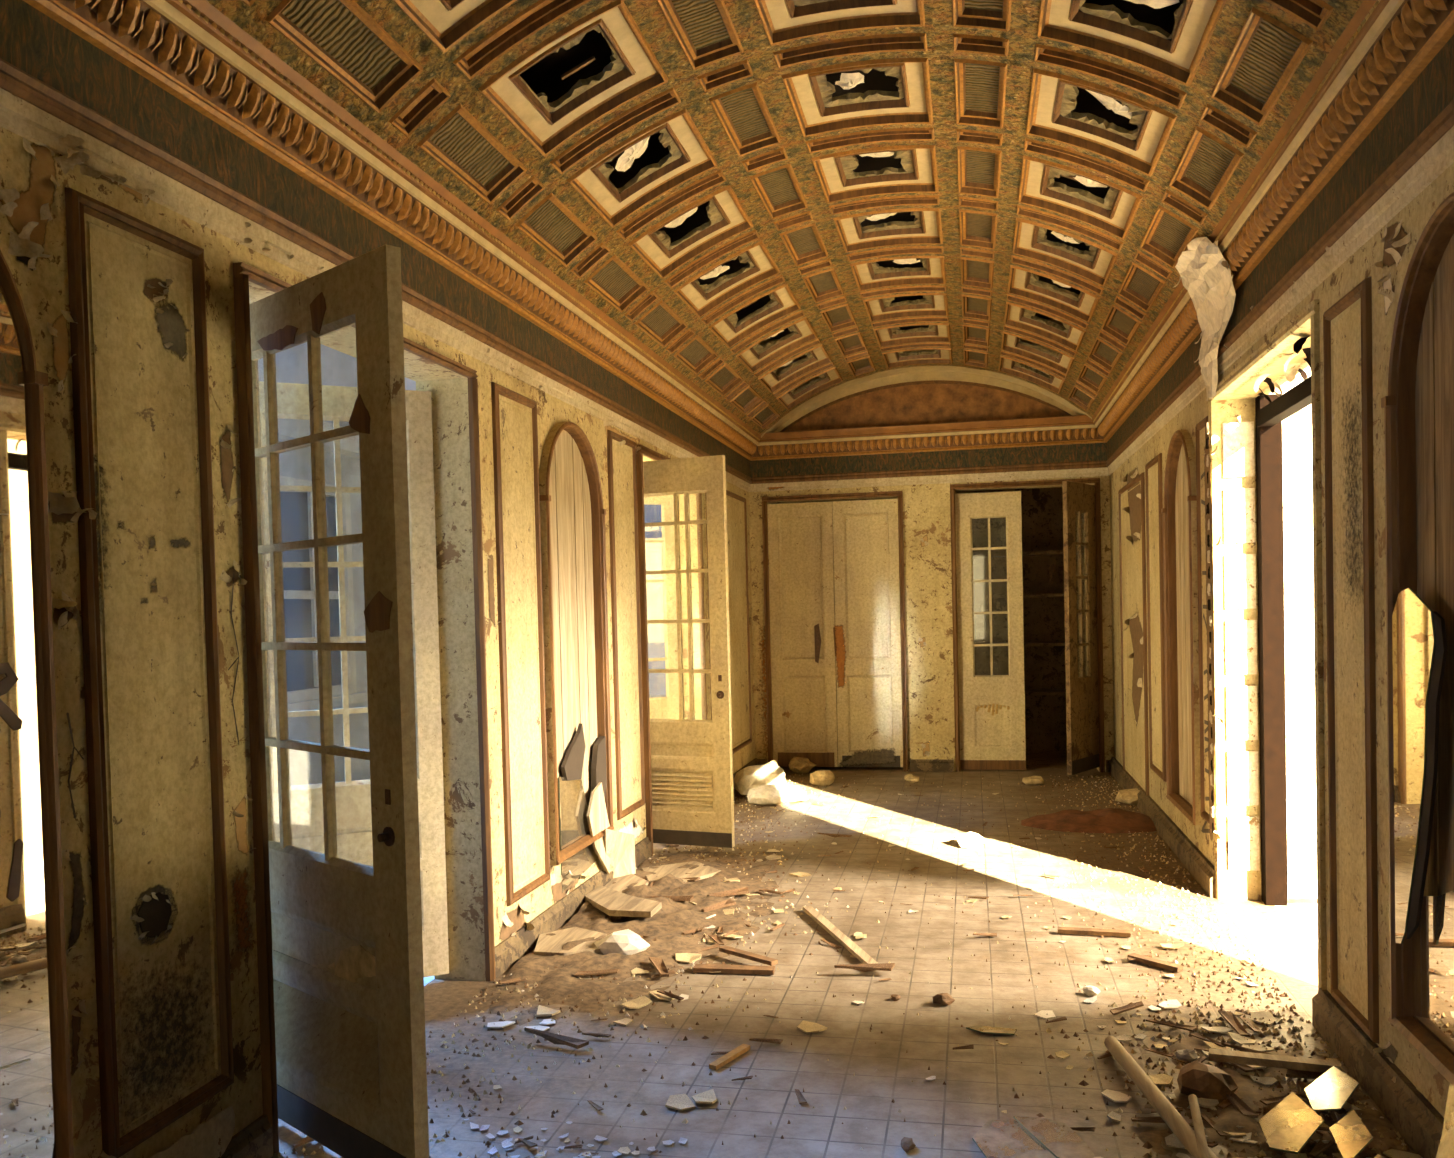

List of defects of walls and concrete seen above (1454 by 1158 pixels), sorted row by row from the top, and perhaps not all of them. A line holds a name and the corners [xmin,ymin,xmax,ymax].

flaking render [1174,237,1311,403]